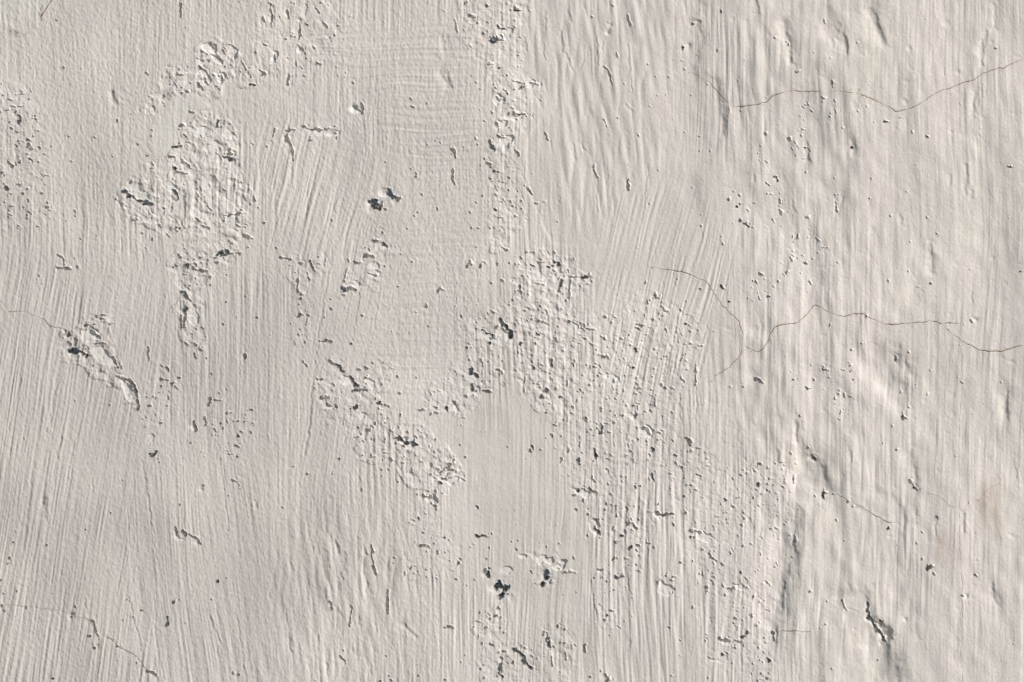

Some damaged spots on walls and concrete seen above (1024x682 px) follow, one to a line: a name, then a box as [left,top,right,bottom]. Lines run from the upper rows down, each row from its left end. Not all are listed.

spalling [57,0,342,429]
spalling [313,0,803,682]
crack [653,266,1024,682]
crack [689,57,1024,116]